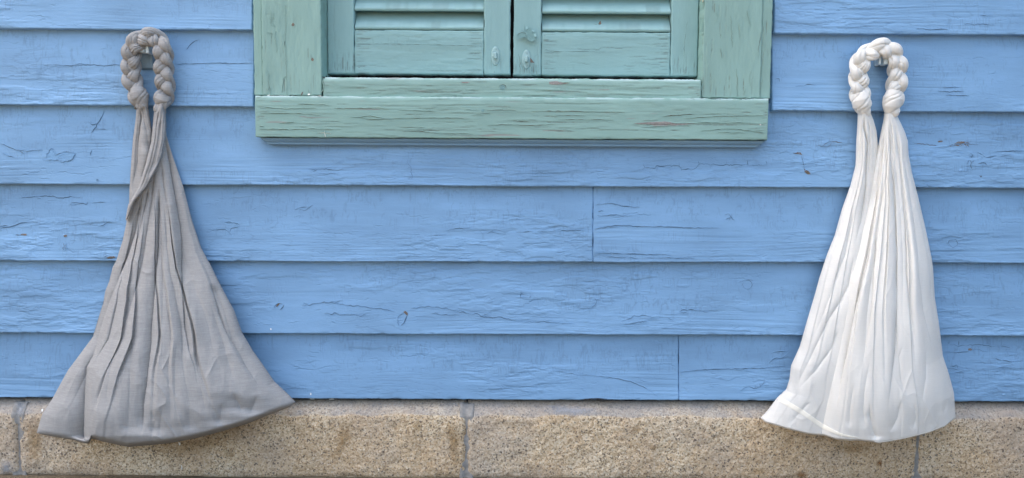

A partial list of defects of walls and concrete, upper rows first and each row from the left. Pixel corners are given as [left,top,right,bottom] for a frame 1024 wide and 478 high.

crack [638,160,768,171]
crack [310,292,598,338]